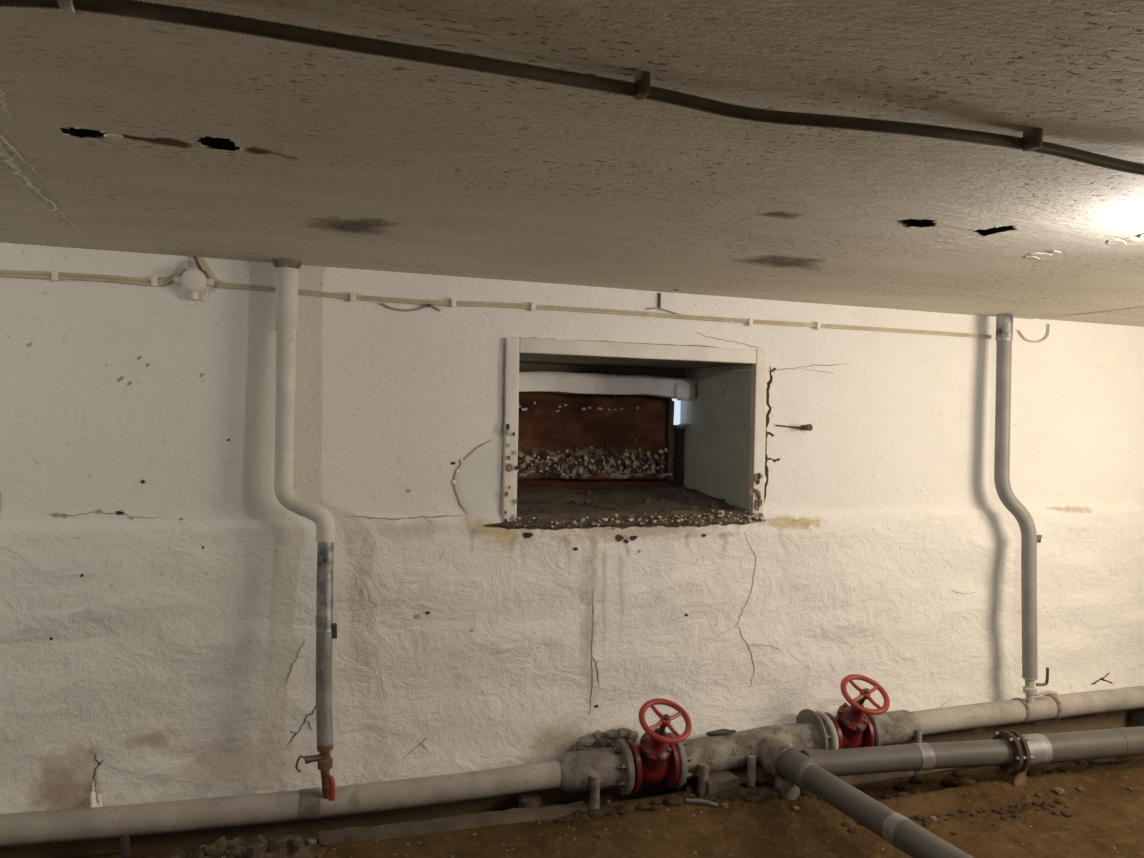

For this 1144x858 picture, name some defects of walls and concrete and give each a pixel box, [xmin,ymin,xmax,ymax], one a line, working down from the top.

crack [706,532,781,685]
crack [290,706,316,743]